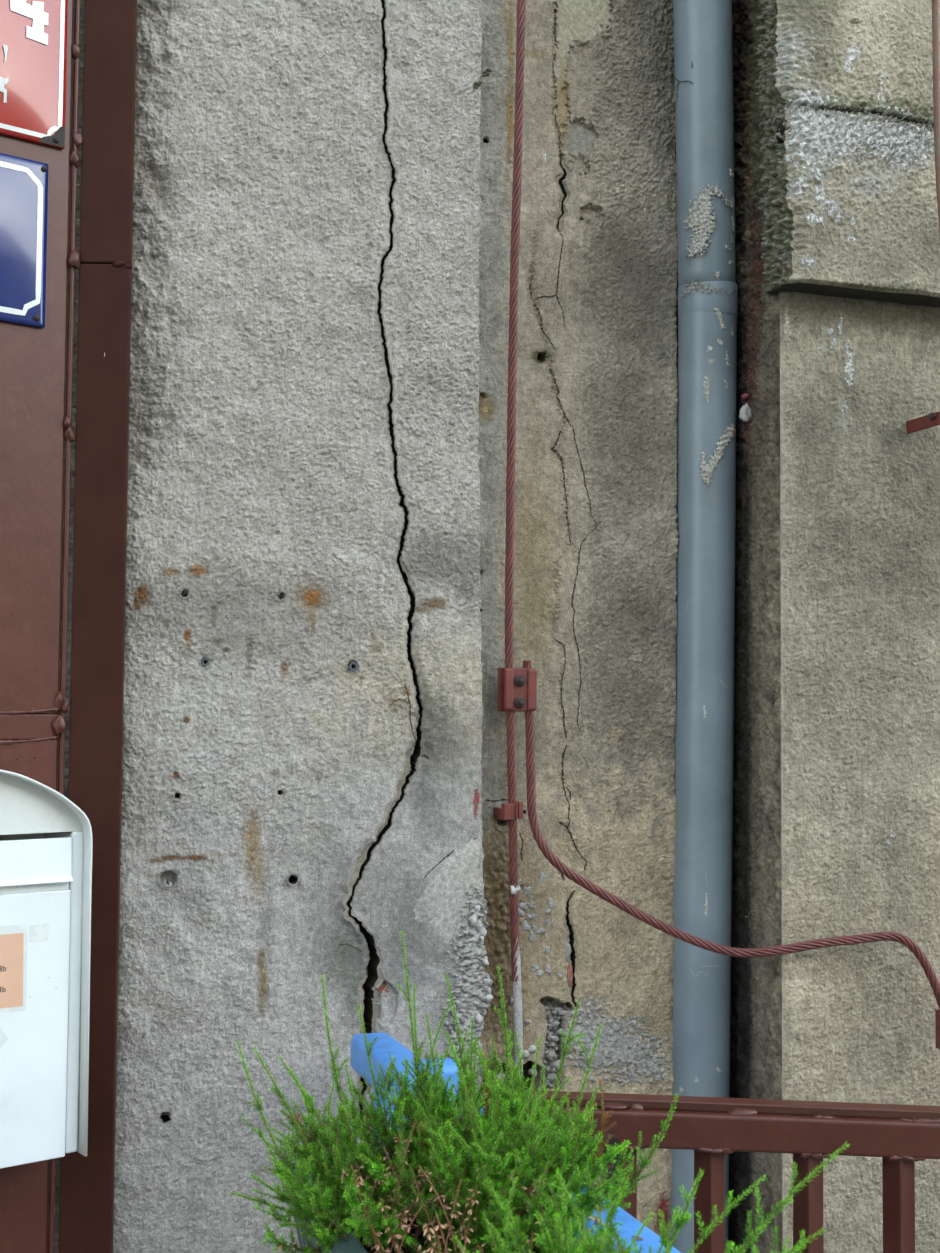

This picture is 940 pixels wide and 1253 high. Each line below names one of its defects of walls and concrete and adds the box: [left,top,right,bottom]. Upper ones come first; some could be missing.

crack [529,0,572,328]
efflorescence [776,25,935,242]
crack [339,0,429,1034]
corrosion [135,583,149,610]
corrosion [303,589,321,621]
corrosion [414,598,445,611]
crack [557,425,603,1010]
spalling [537,997,571,1090]
crack [356,1075,373,1125]